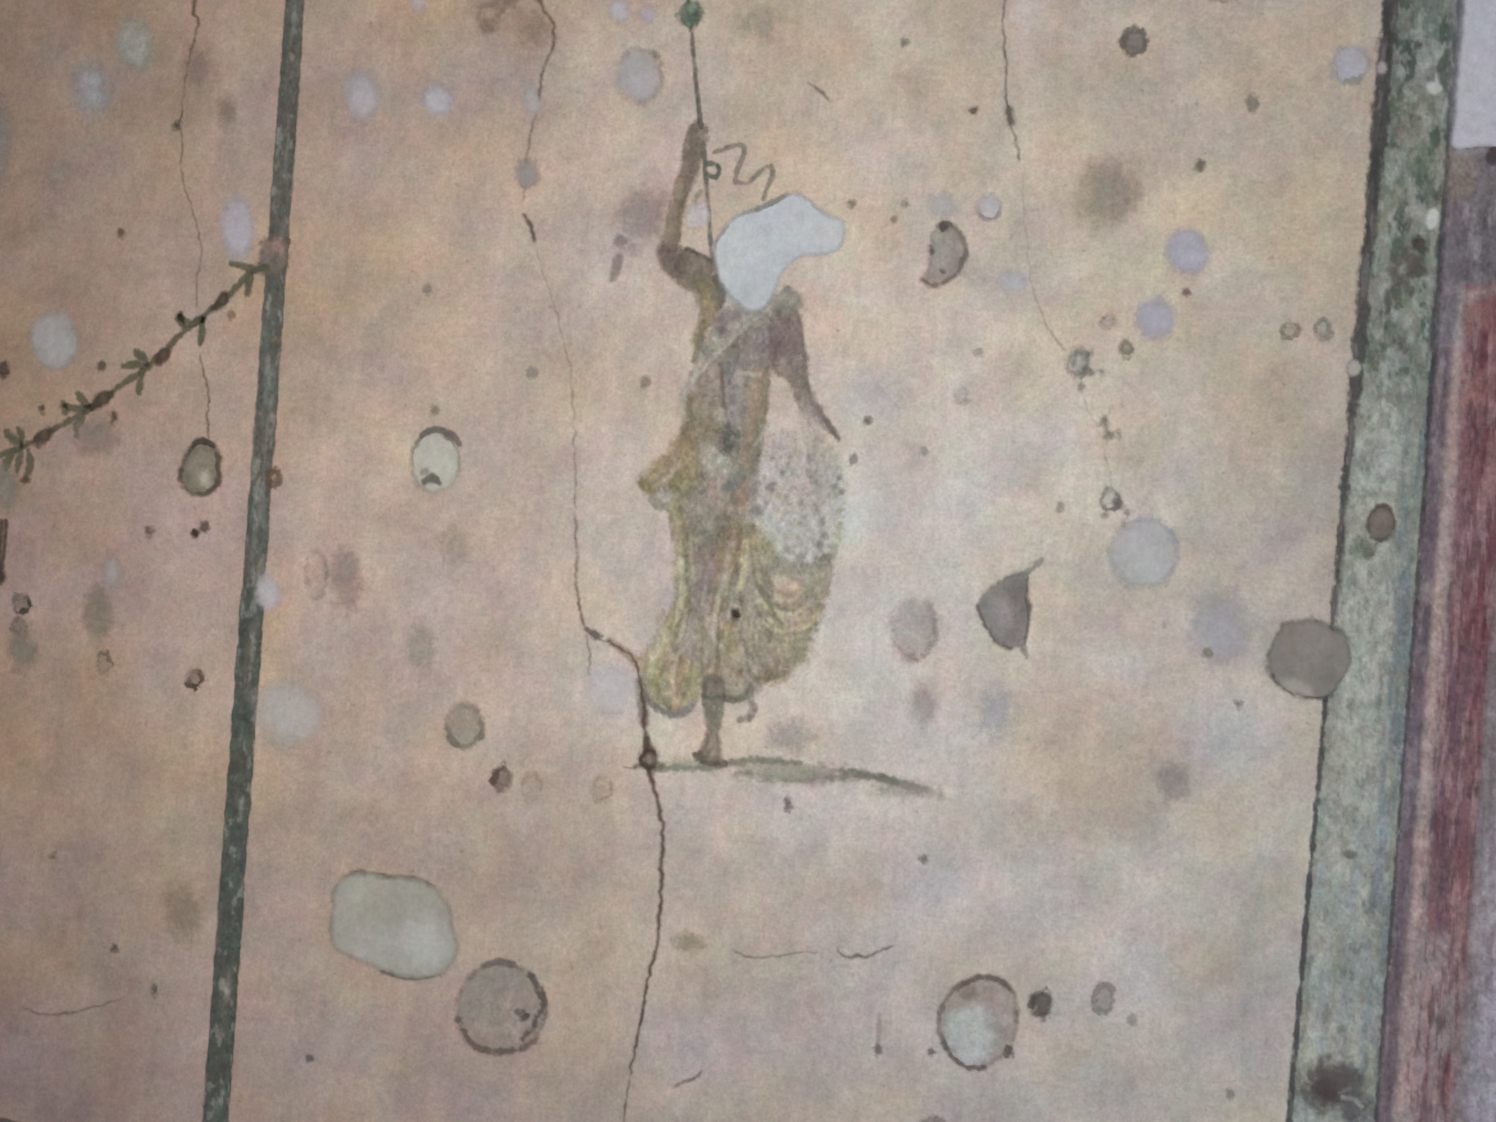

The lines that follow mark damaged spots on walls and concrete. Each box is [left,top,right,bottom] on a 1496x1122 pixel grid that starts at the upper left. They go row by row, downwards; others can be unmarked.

crack [1006,100,1014,124]
crack [524,215,535,241]
damp [420,427,461,446]
damp [422,469,441,485]
crack [578,601,665,1066]